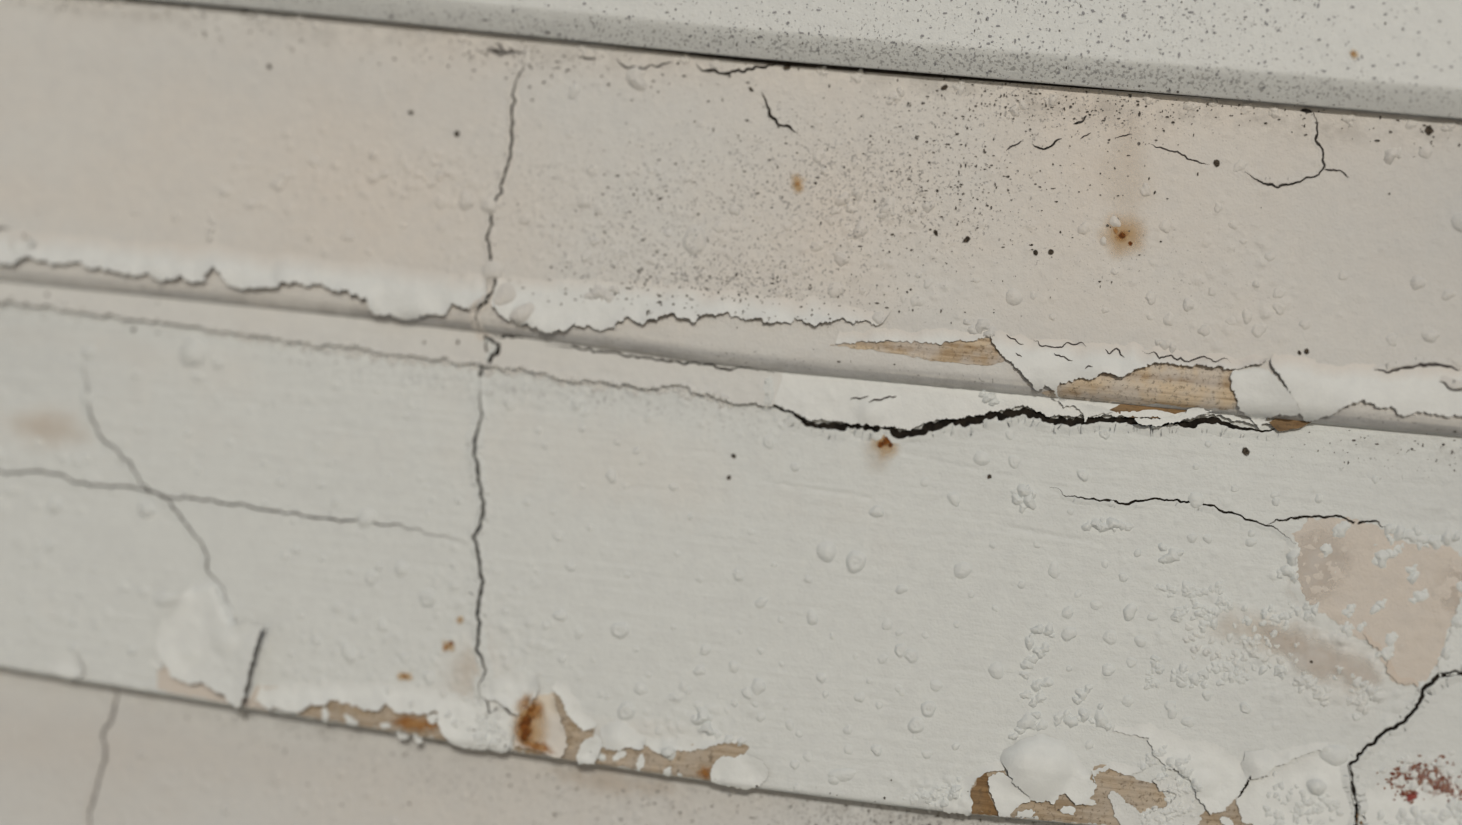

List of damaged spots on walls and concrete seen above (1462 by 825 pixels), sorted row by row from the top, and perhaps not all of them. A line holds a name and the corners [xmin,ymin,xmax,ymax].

crack [1245,108,1349,188]
corrosion [1112,226,1135,246]
crack [0,43,1296,718]
peeling [0,227,1462,431]
corrosion [877,436,893,453]
peeling [46,651,84,680]
crack [84,686,118,825]
peeling [149,580,769,790]
corrosion [518,699,550,752]
spalling [1268,515,1462,690]
crack [1339,663,1462,825]